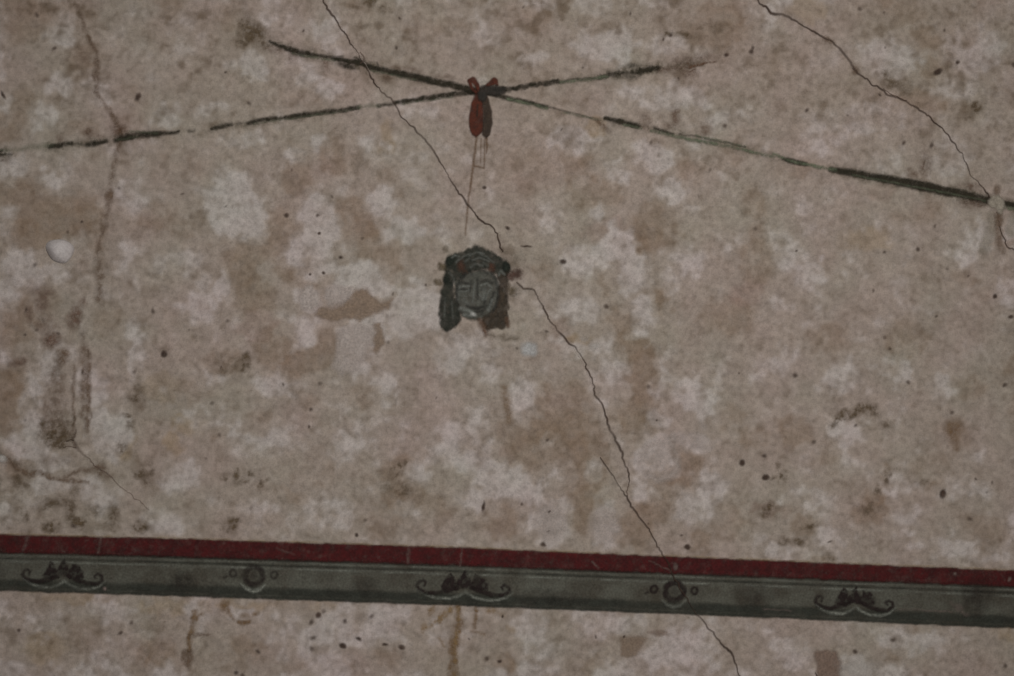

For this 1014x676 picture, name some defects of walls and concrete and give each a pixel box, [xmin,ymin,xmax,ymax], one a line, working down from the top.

crack [323,0,381,91]
crack [434,151,503,252]
crack [758,0,1013,249]
crack [517,282,740,676]